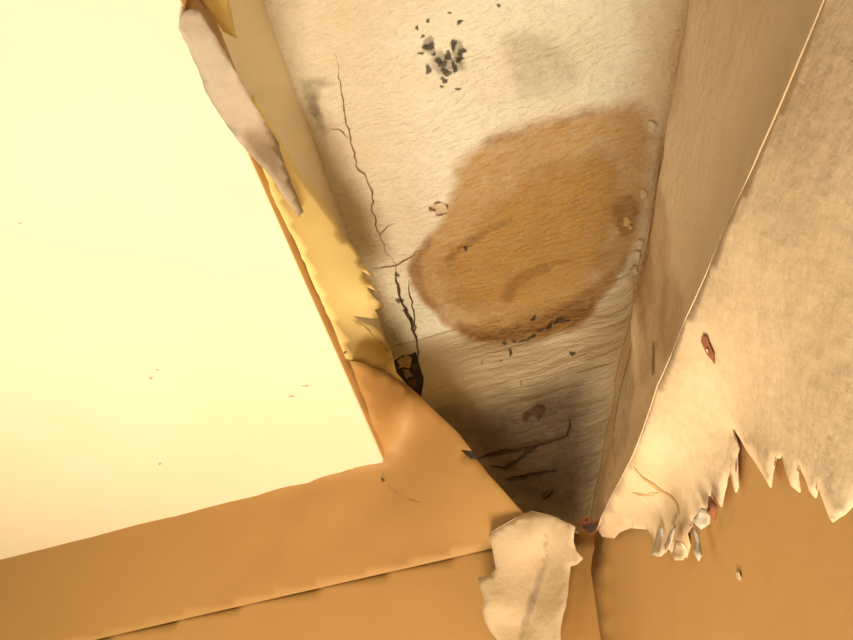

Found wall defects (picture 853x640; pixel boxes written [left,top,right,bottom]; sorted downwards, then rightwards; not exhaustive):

crack [334,54,421,356]
spalling [394,352,424,396]
crack [479,420,571,479]
damp [411,0,690,356]
corrosion [701,336,715,364]
peeling [582,0,853,561]